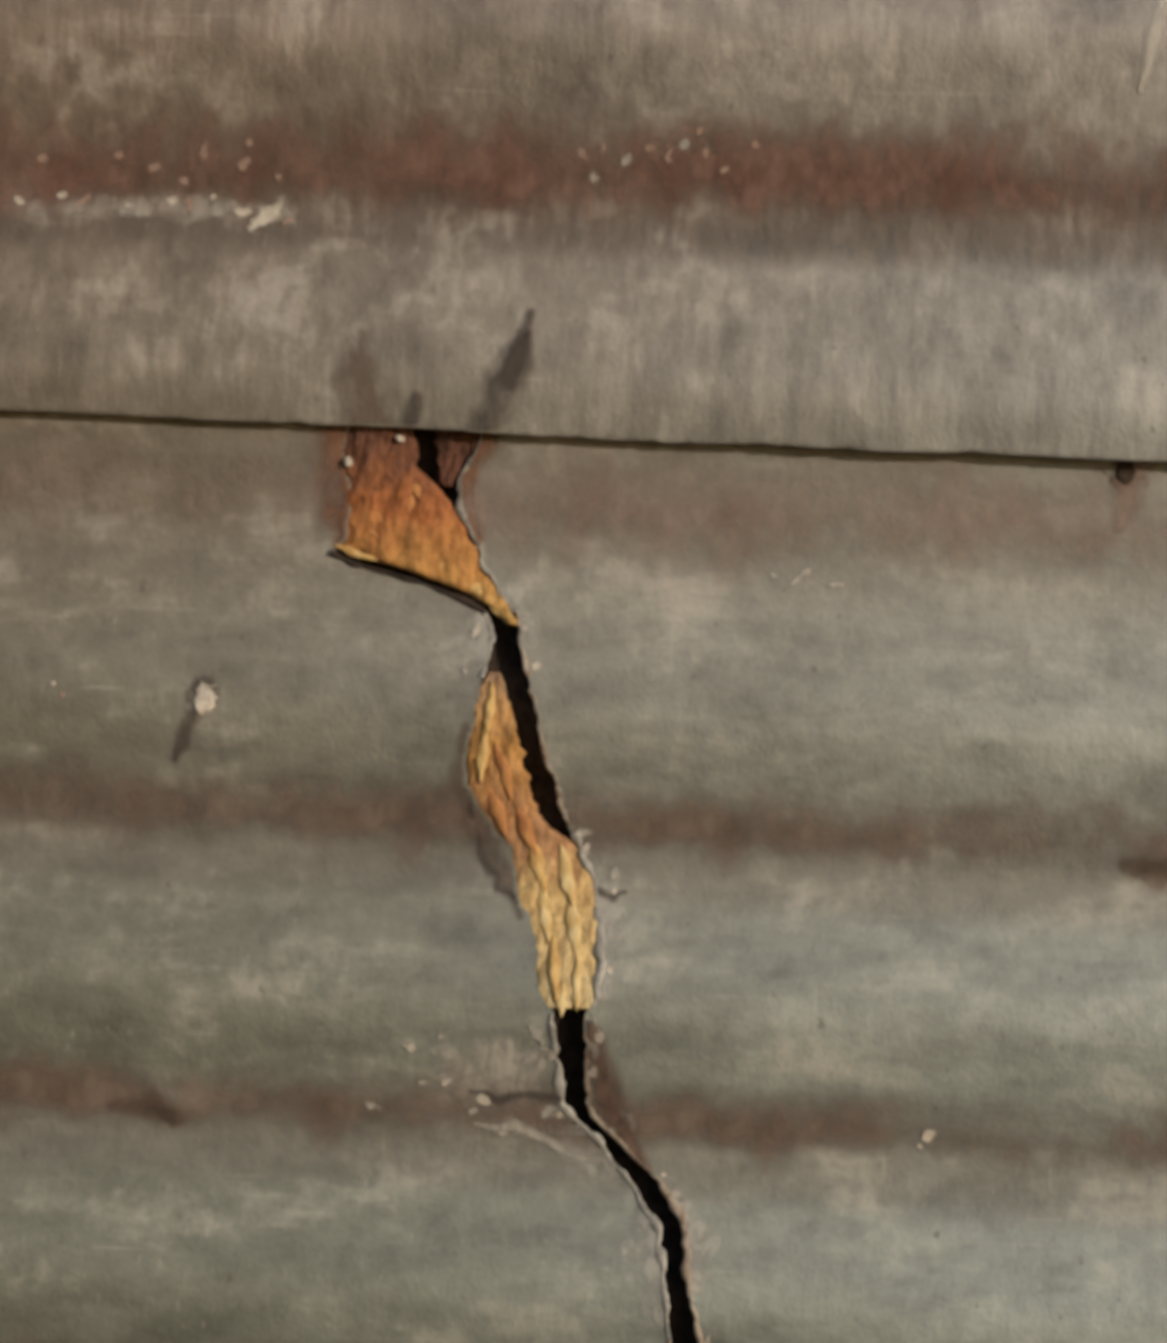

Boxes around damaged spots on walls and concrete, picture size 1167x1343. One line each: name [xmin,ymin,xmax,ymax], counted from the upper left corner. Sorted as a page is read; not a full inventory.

corrosion [0,118,1077,212]
leakage [479,310,534,430]
spalling [323,426,518,625]
spalling [418,658,598,1136]
crack [457,587,716,1343]